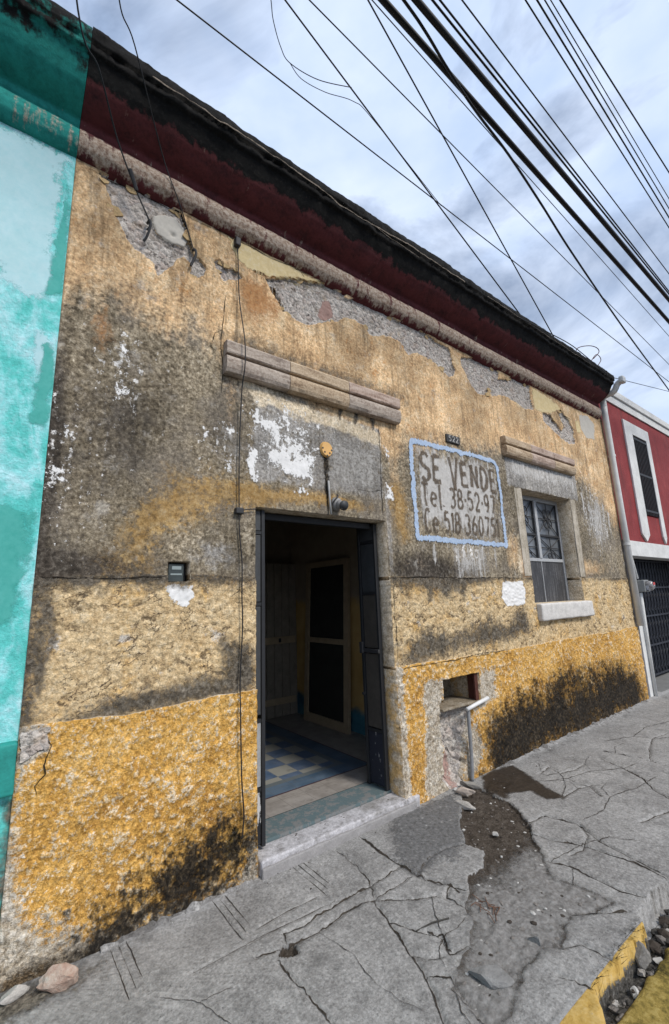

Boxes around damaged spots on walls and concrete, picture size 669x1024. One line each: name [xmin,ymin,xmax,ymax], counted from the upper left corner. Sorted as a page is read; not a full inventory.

flaking render [99,173,595,444]
peeling [222,399,321,497]
flaking render [19,727,51,763]
crack [34,739,52,796]
crack [517,721,669,915]
crack [258,837,479,1024]
crack [160,987,232,1024]